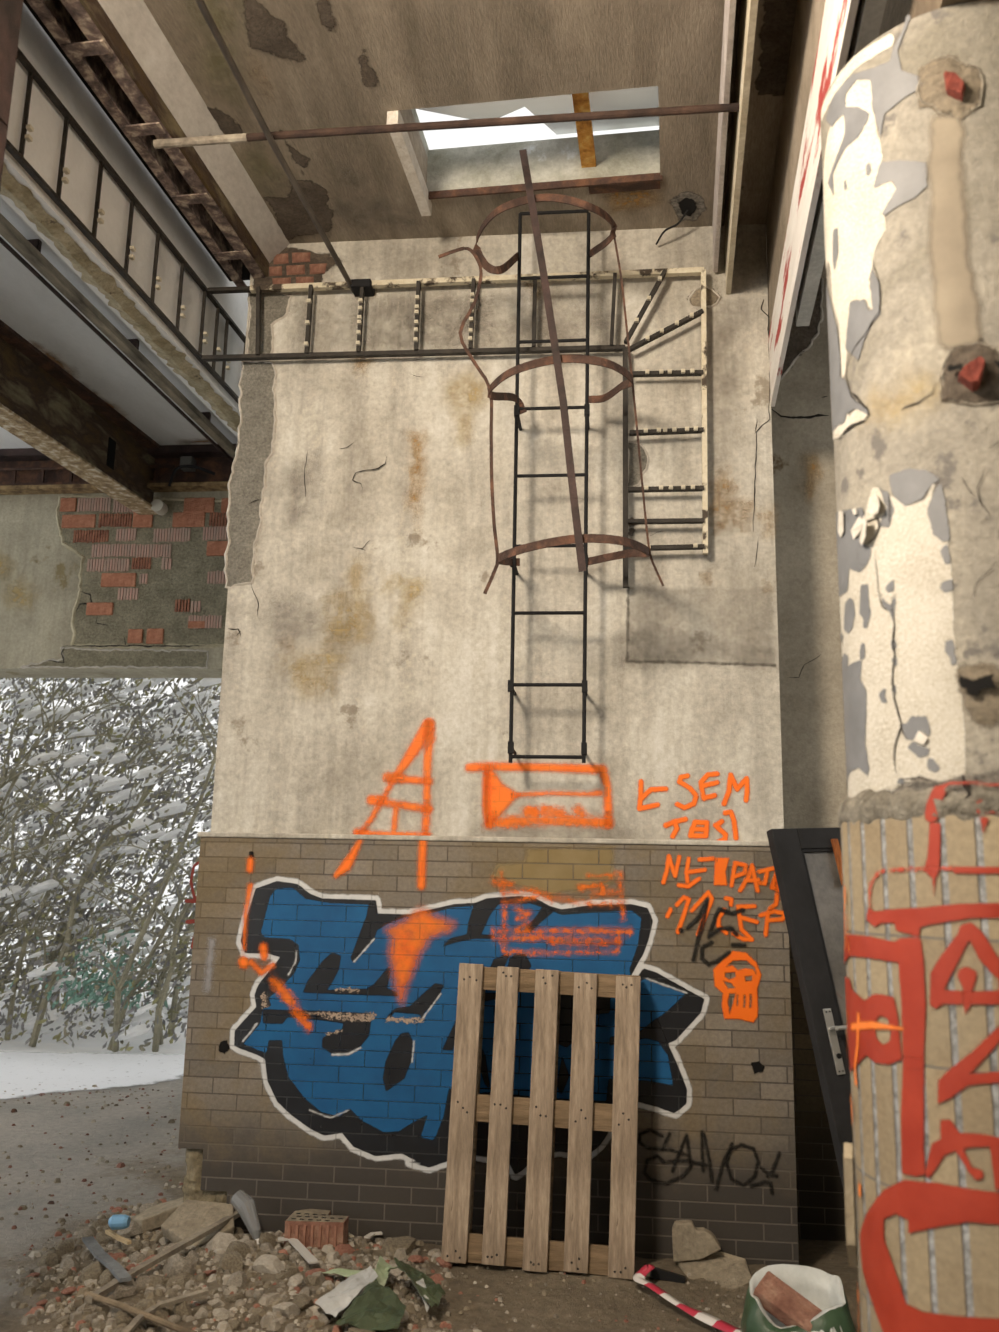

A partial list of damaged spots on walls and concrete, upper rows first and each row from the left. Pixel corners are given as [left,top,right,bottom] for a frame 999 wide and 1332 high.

spalling [243,0,306,62]
spalling [316,0,336,31]
spalling [359,50,378,87]
spalling [826,15,999,408]
peeling [780,228,880,434]
spalling [0,130,341,669]
peeling [836,469,953,794]
spalling [945,639,999,728]
spalling [890,716,999,794]